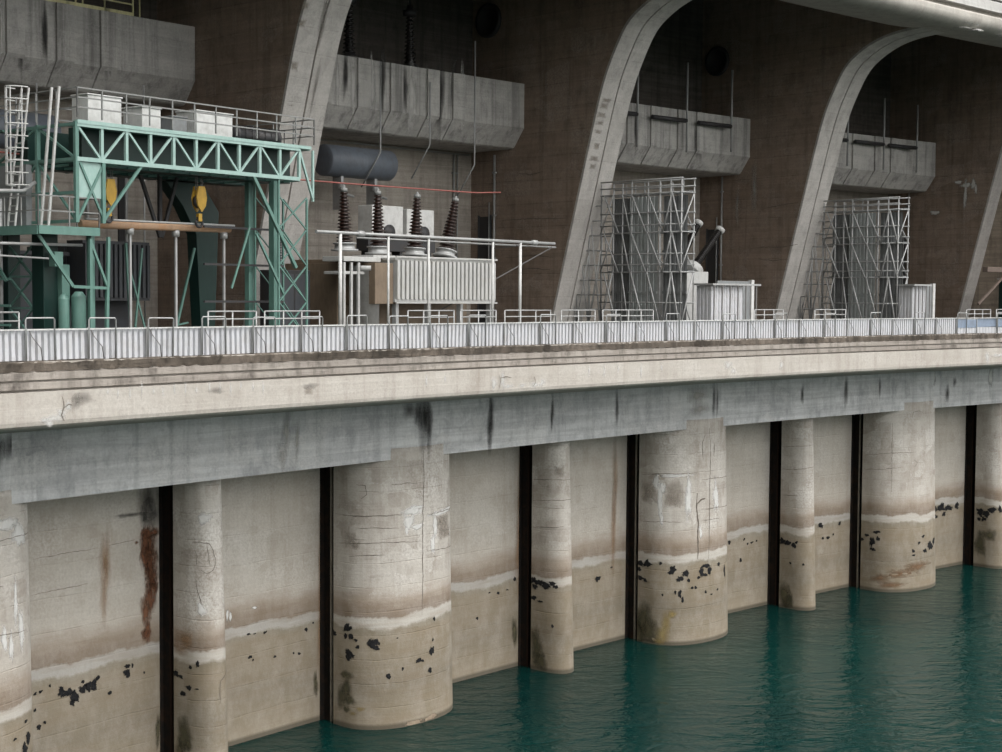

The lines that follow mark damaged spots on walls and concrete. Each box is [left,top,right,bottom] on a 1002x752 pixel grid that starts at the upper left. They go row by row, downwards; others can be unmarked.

water stain [407,407,431,437]
crack [644,428,725,559]
peeling [935,502,959,518]
rust [135,528,158,642]
peeling [531,577,558,602]
peeling [638,559,725,603]
peeling [333,623,380,661]
peeling [33,675,112,706]
water stain [339,671,362,714]
peeling [13,708,46,752]